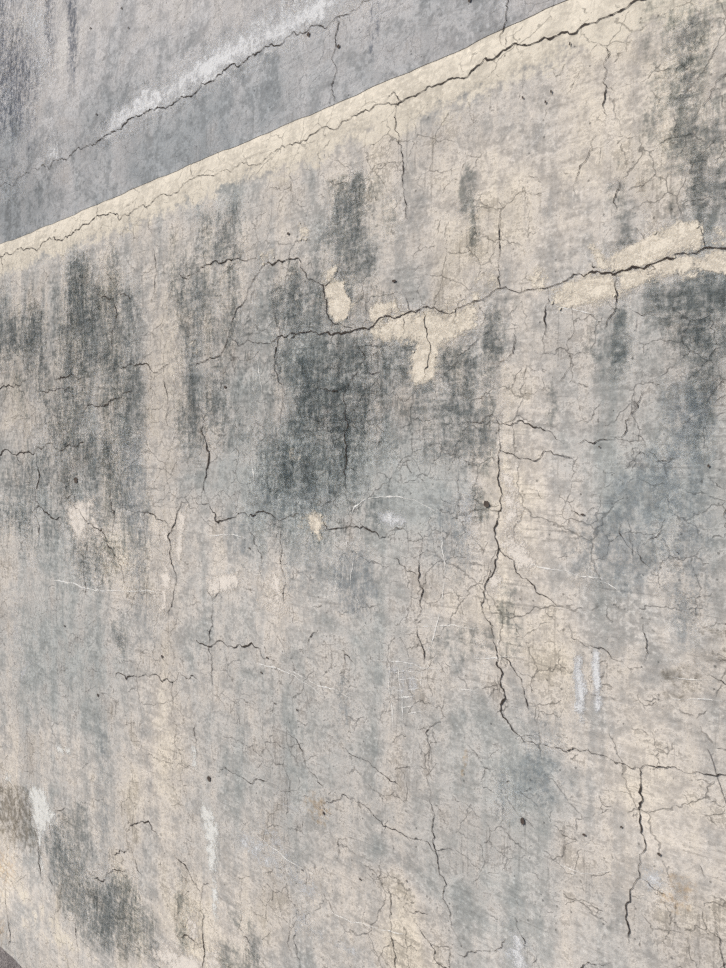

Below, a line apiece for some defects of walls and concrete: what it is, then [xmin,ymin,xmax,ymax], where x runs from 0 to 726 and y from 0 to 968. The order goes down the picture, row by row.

damp [101,0,352,139]
crack [0,0,636,264]
crack [82,362,170,423]
crack [179,209,726,495]
crack [0,442,124,582]
crack [142,411,425,664]
efflorescence [378,511,406,527]
crack [115,583,264,757]
crack [459,394,724,943]
crack [95,809,157,882]
crack [176,858,208,965]
crack [289,723,525,968]